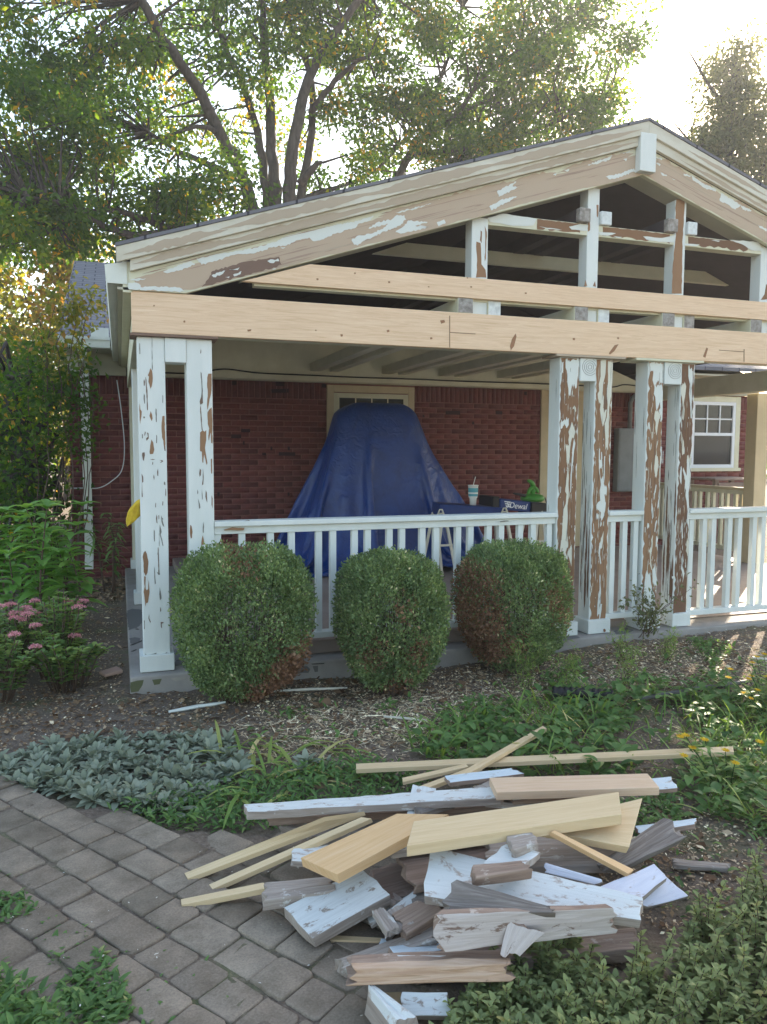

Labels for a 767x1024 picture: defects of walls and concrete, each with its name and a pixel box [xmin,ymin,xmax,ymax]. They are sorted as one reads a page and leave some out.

peeling [128,129,767,294]
peeling [139,405,165,454]
peeling [200,374,213,474]
peeling [557,358,613,621]
peeling [641,361,694,613]